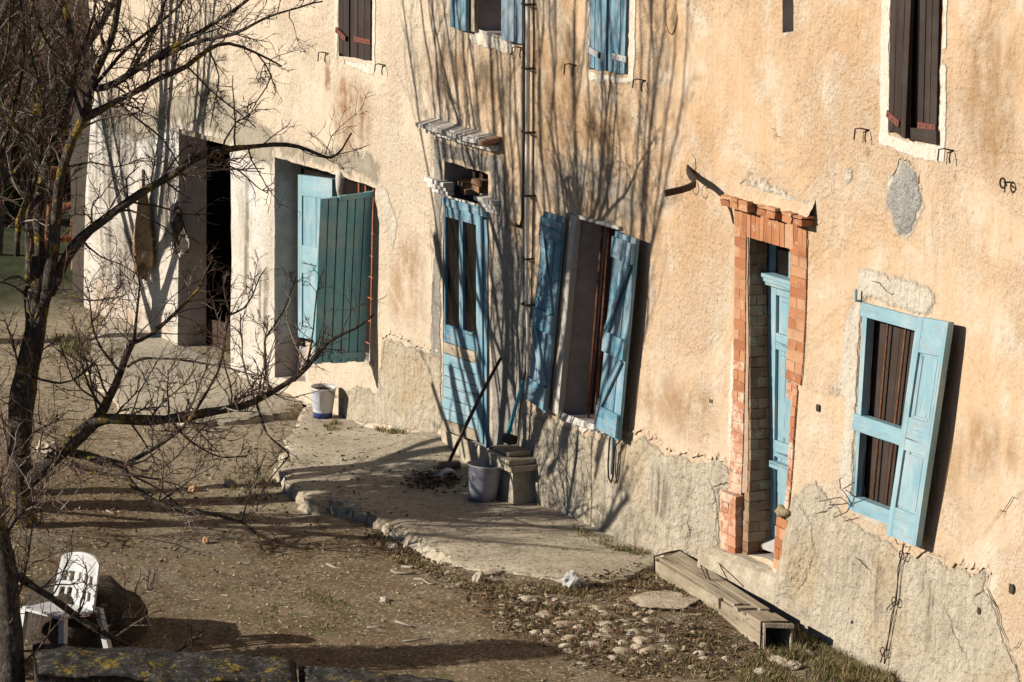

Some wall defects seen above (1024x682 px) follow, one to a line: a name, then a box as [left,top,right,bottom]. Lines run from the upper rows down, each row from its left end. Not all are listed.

peeling [339,330,442,433]
peeling [517,342,736,562]
peeling [773,481,1019,682]